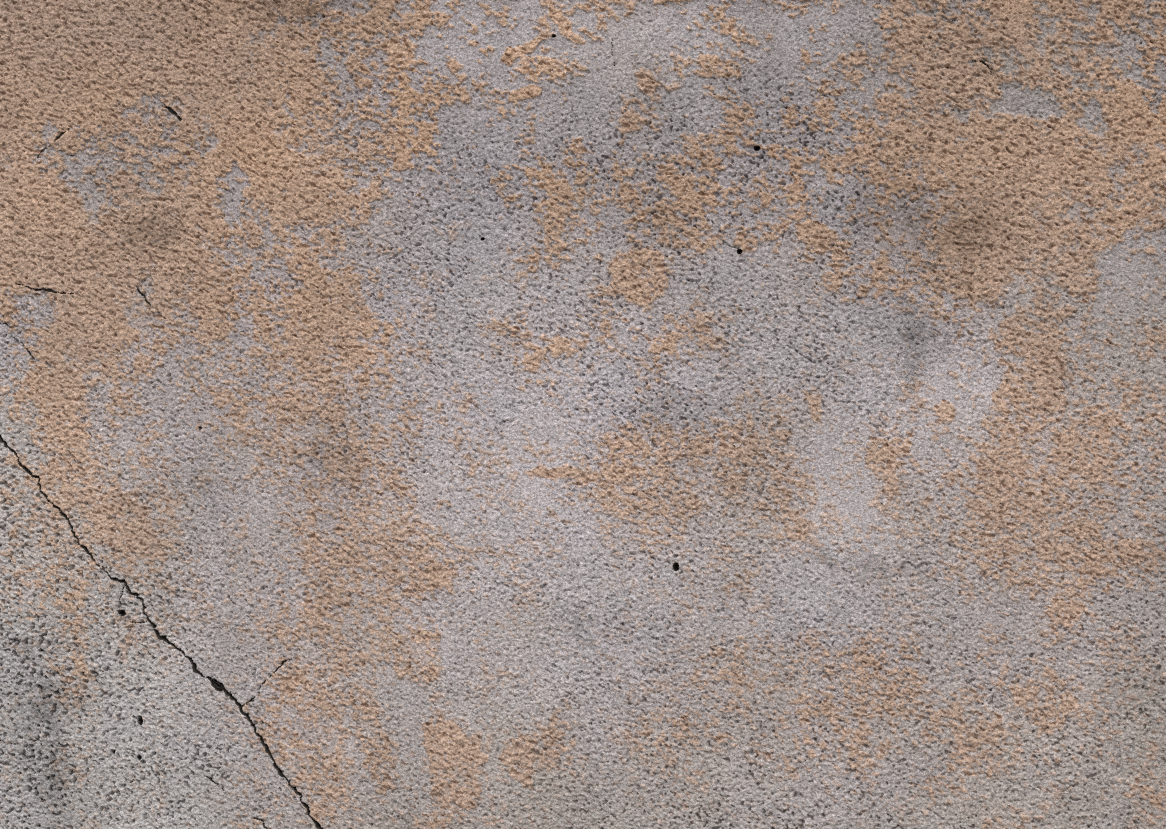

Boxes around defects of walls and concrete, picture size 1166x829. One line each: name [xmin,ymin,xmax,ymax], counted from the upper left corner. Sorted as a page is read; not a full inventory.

peeling [1119,17,1166,103]
peeling [25,104,203,204]
peeling [222,151,246,258]
crack [17,283,73,294]
peeling [1089,226,1166,341]
peeling [0,322,33,403]
peeling [341,0,925,723]
peeling [887,346,1136,545]
spalling [0,464,284,829]
crack [0,435,323,829]
peeling [352,704,397,795]
peeling [422,715,563,811]